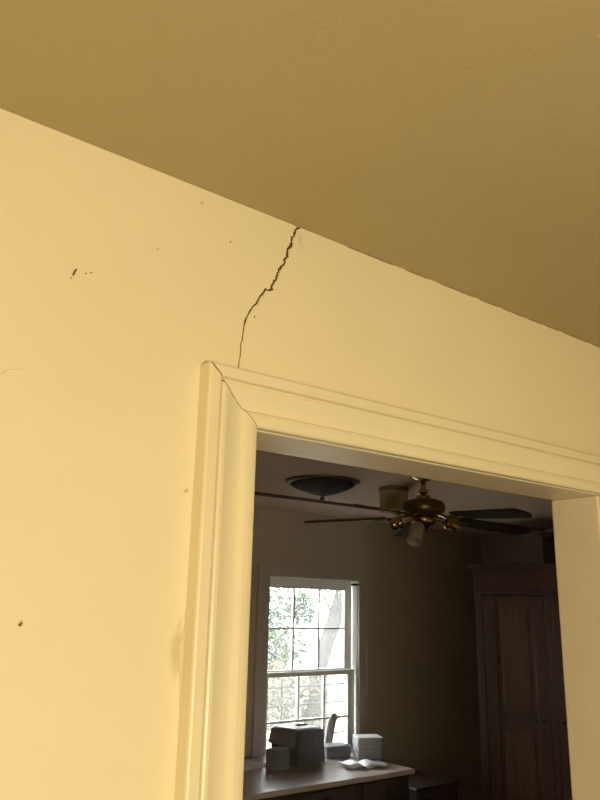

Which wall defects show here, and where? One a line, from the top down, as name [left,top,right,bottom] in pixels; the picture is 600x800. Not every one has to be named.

crack [211,227,300,426]